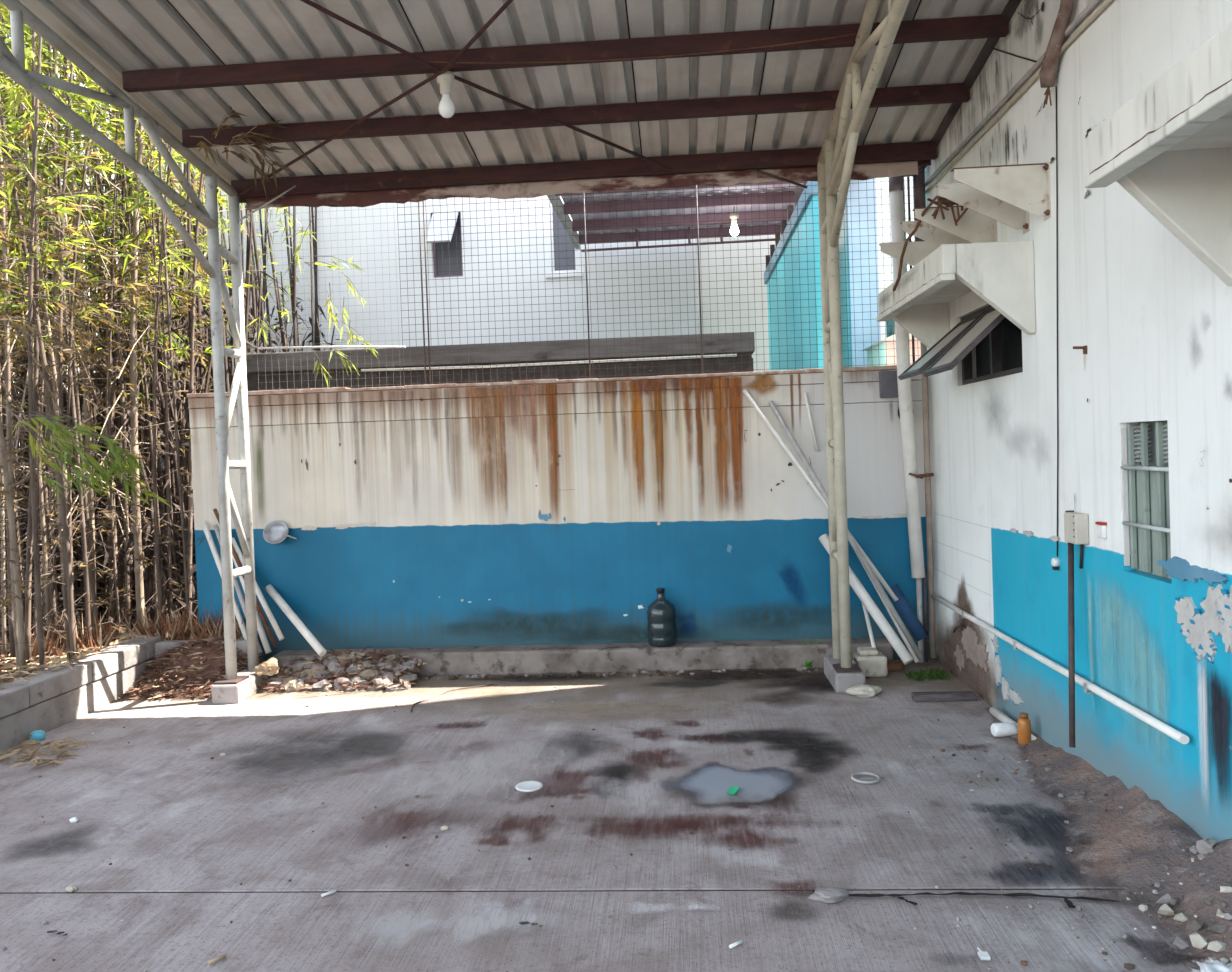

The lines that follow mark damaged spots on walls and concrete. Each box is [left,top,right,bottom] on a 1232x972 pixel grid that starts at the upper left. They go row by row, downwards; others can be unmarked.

rust [468,384,558,506]
rust [606,374,801,502]
peeling [954,626,1024,705]
peeling [1157,556,1232,664]